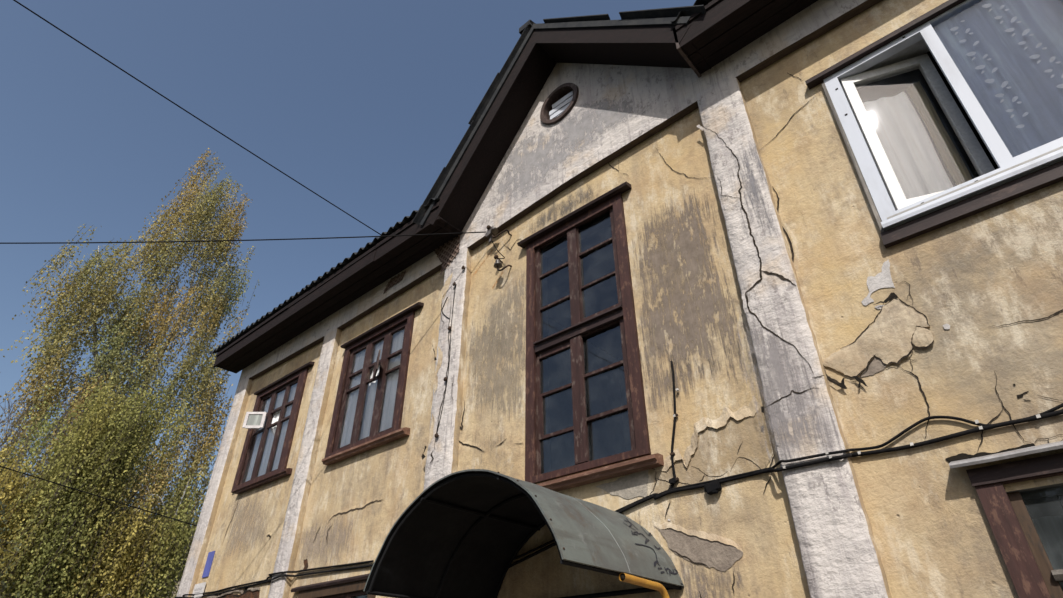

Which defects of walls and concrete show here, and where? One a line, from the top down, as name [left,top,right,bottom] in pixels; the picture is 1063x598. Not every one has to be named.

crack [656,125,934,445]
peeling [862,259,895,309]
damp [633,193,838,458]
crack [993,309,1063,327]
spalling [860,356,887,377]
spalling [596,396,773,499]
spalling [652,519,743,571]